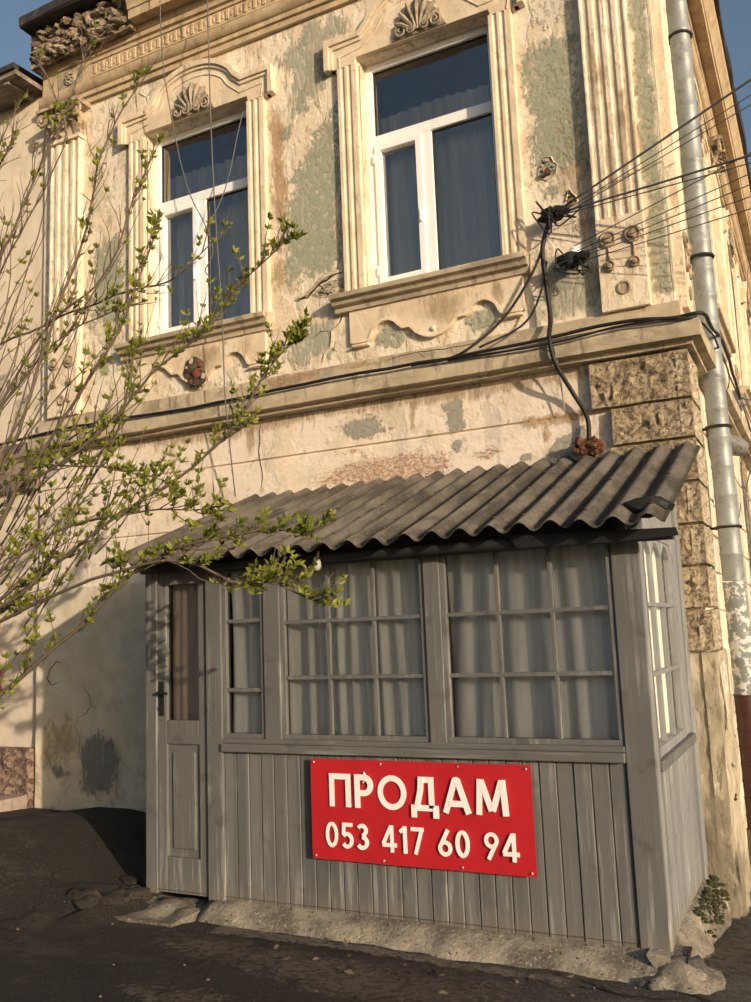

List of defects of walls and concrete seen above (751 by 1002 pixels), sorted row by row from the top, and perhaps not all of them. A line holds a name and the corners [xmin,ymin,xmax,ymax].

peeling [275,4,358,141]
peeling [520,0,584,209]
peeling [283,102,345,298]
peeling [267,319,336,387]
flaking render [313,439,462,487]